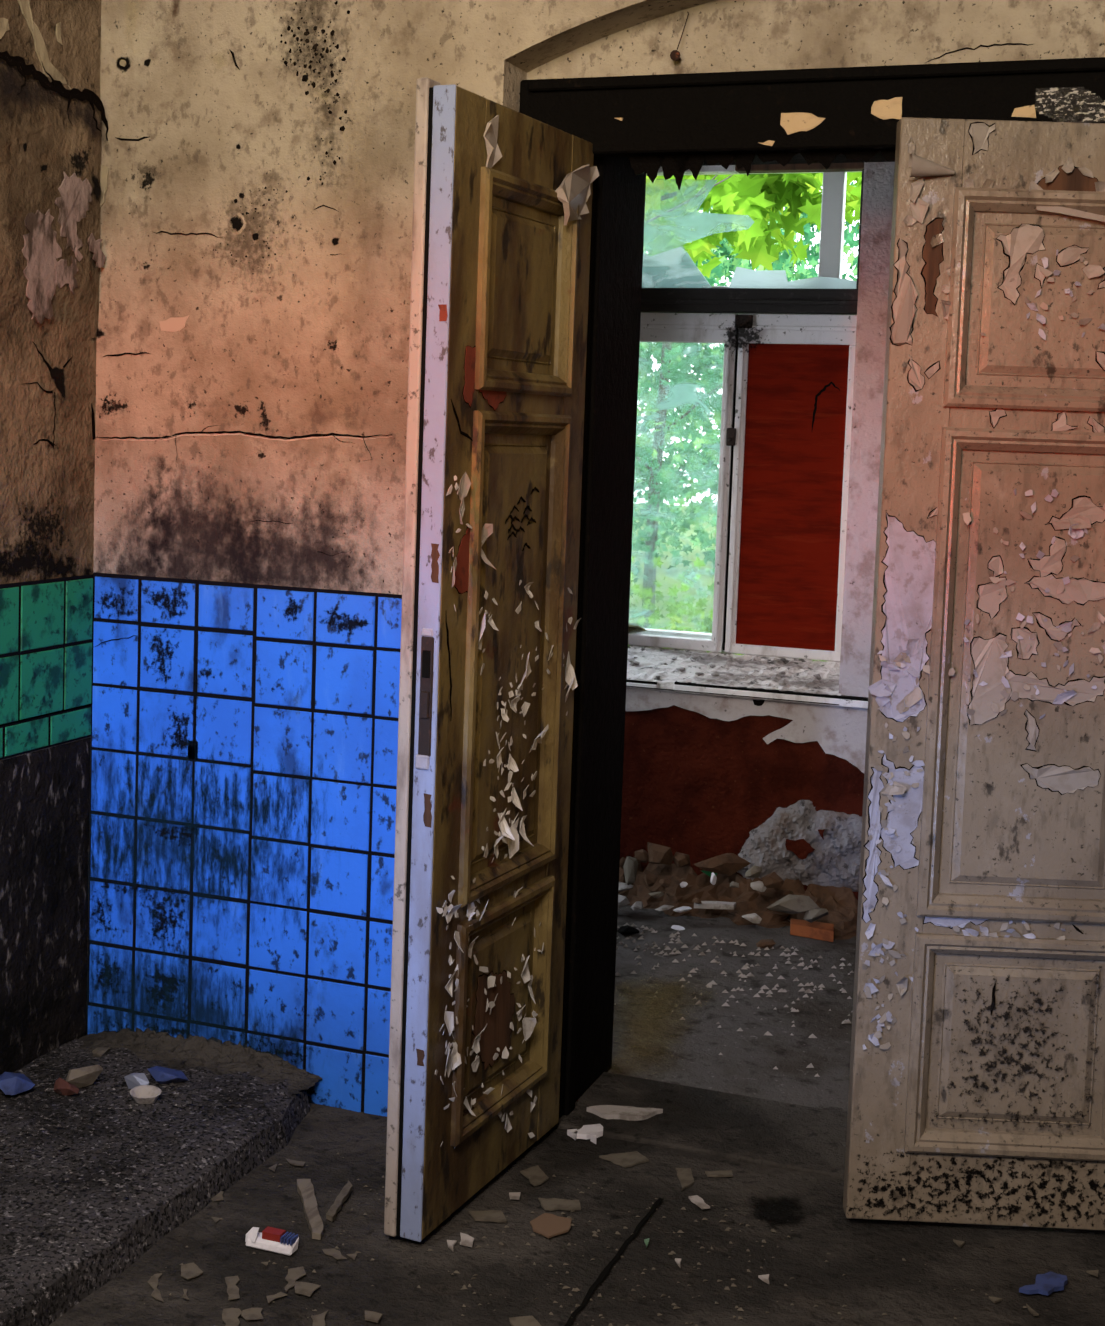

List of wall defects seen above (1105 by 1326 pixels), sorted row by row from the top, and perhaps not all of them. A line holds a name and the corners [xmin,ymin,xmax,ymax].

crack [0,51,148,141]
damp [280,0,347,131]
peeling [760,112,826,146]
peeling [871,97,903,120]
flaking render [22,165,110,324]
crack [96,425,392,461]
damp [98,580,195,688]
damp [320,607,369,636]
peeling [963,488,1105,795]
spalling [620,512,1036,1050]
damp [90,832,190,948]
crack [564,1198,664,1326]